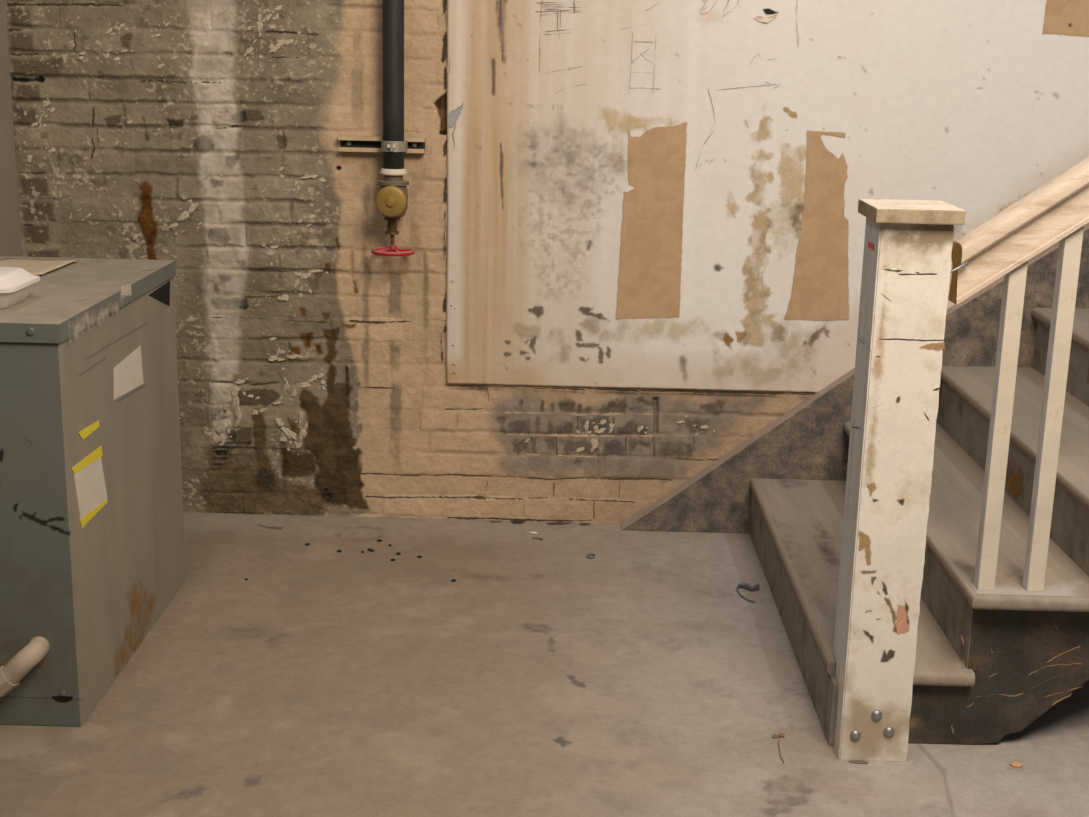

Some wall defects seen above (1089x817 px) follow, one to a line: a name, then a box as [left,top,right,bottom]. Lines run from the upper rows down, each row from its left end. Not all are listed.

peeling [242,5,305,60]
peeling [1043,0,1089,36]
damp [604,110,646,130]
corrosion [138,182,158,260]
peeling [616,122,687,319]
damp [769,144,807,245]
peeling [785,131,849,321]
peeling [204,332,327,455]
damp [205,327,368,516]
spalling [576,330,611,363]
peeling [859,531,909,634]
peeling [881,650,895,662]